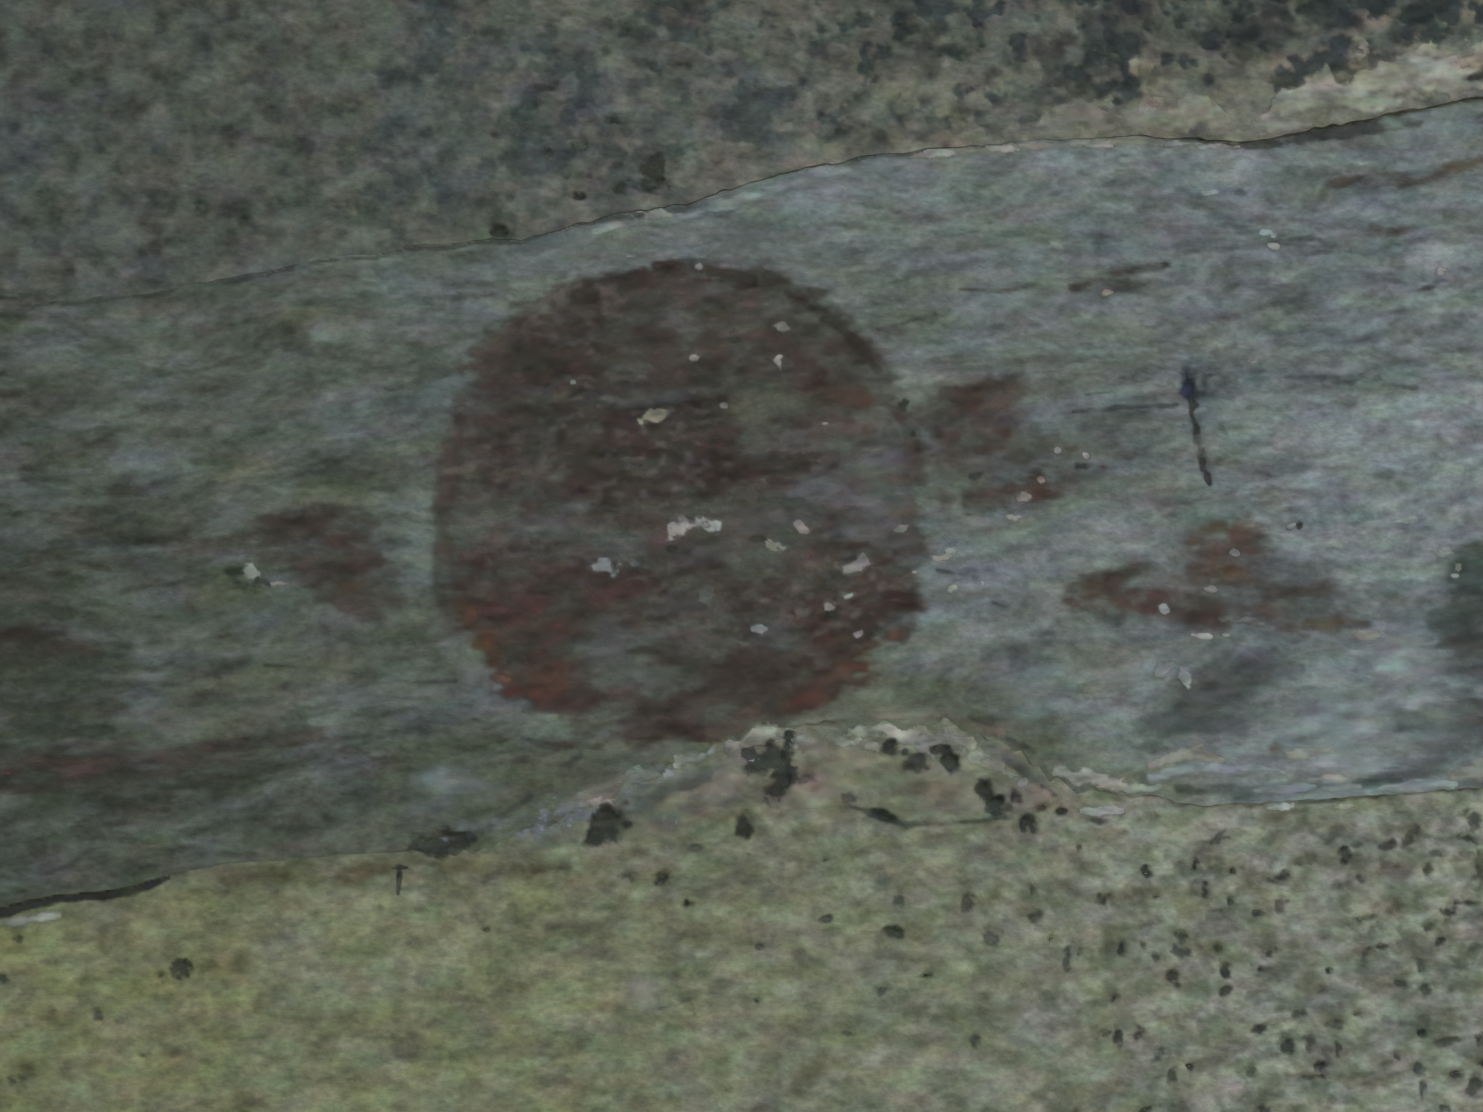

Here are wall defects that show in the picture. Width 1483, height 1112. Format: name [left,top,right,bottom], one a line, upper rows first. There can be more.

crack [908,120,1422,159]
crack [573,165,855,233]
crack [404,236,535,250]
corrosion [1069,268,1138,296]
crack [1077,372,1224,486]
corrosion [433,260,925,743]
corrosion [1002,474,1059,521]
corrosion [1090,521,1320,640]
spalling [535,706,1314,845]
flaking render [1333,758,1483,791]
spalling [408,826,476,857]
crack [0,876,170,926]